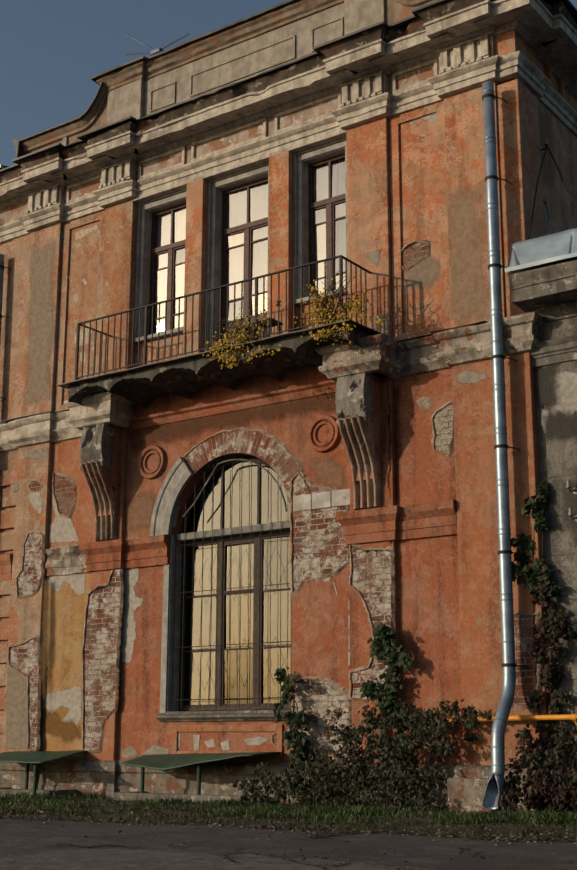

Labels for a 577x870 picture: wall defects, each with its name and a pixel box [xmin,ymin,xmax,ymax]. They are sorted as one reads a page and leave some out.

flaking render [401,239,431,271]
flaking render [416,396,455,458]
water stain [536,364,577,439]
flaking render [8,471,143,754]
flaking render [184,427,396,762]
flaking render [512,610,543,713]